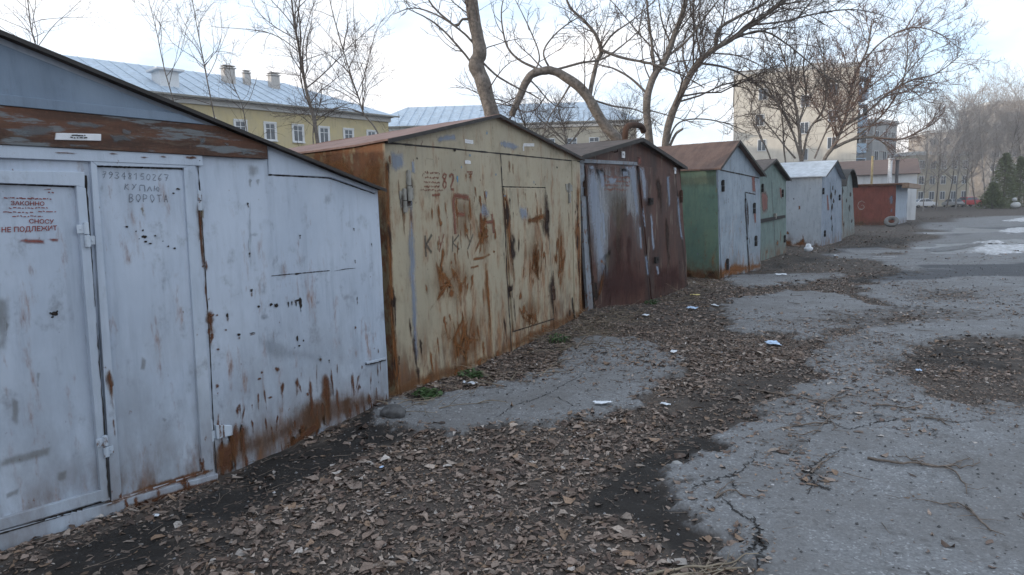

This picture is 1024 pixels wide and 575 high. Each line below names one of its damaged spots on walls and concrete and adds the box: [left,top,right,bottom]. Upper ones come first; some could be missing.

corrosion [107,156,586,508]
corrosion [655,219,760,292]